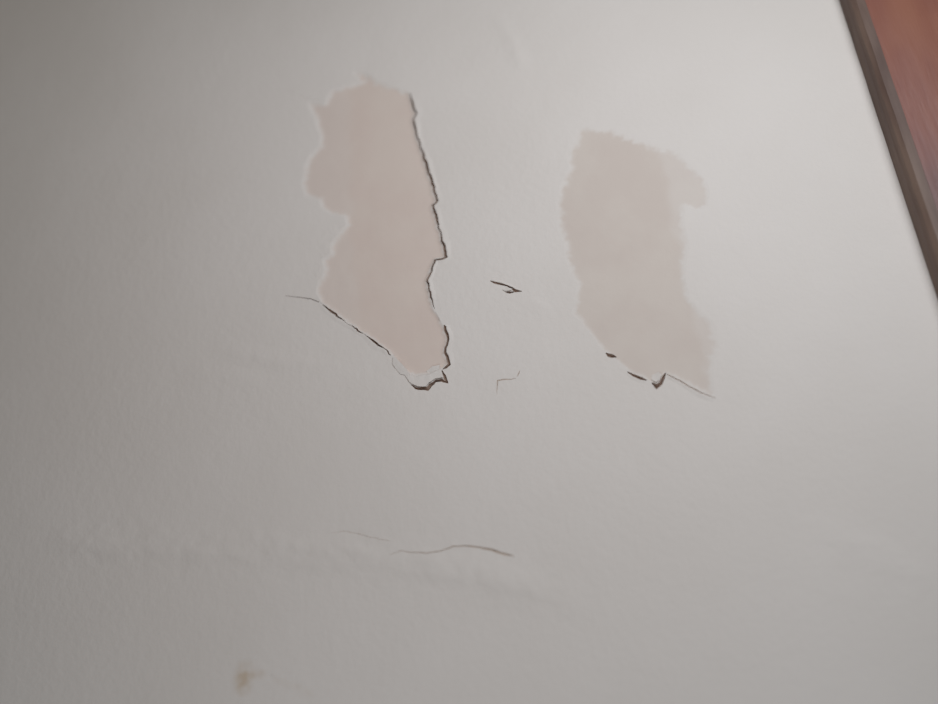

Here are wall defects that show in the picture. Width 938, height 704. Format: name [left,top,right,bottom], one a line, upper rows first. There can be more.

peeling [290,69,455,391]
peeling [555,126,720,403]